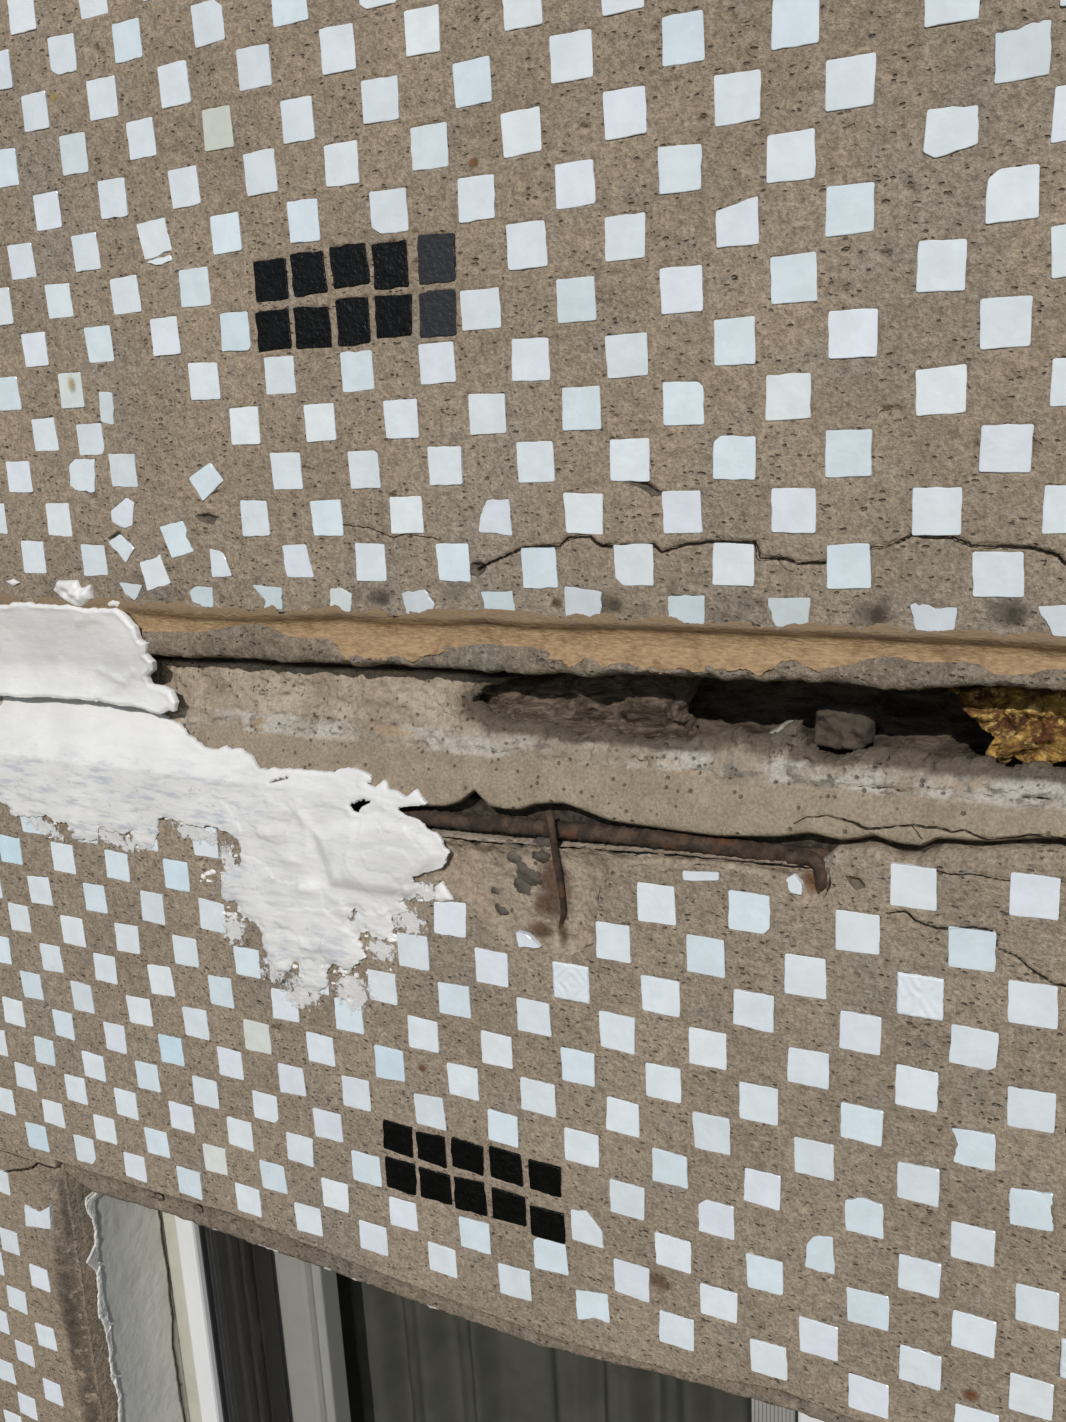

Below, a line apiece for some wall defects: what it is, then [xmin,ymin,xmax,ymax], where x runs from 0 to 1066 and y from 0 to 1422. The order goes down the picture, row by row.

spalling [108,463,232,607]
spalling [253,544,314,610]
spalling [564,586,602,617]
spalling [613,543,654,586]
crack [476,534,826,572]
spalling [668,595,705,624]
spalling [910,603,957,632]
crack [872,534,1066,564]
spalling [140,624,1066,767]
rust [531,865,566,942]
spalling [399,807,865,956]
crack [889,910,1066,987]